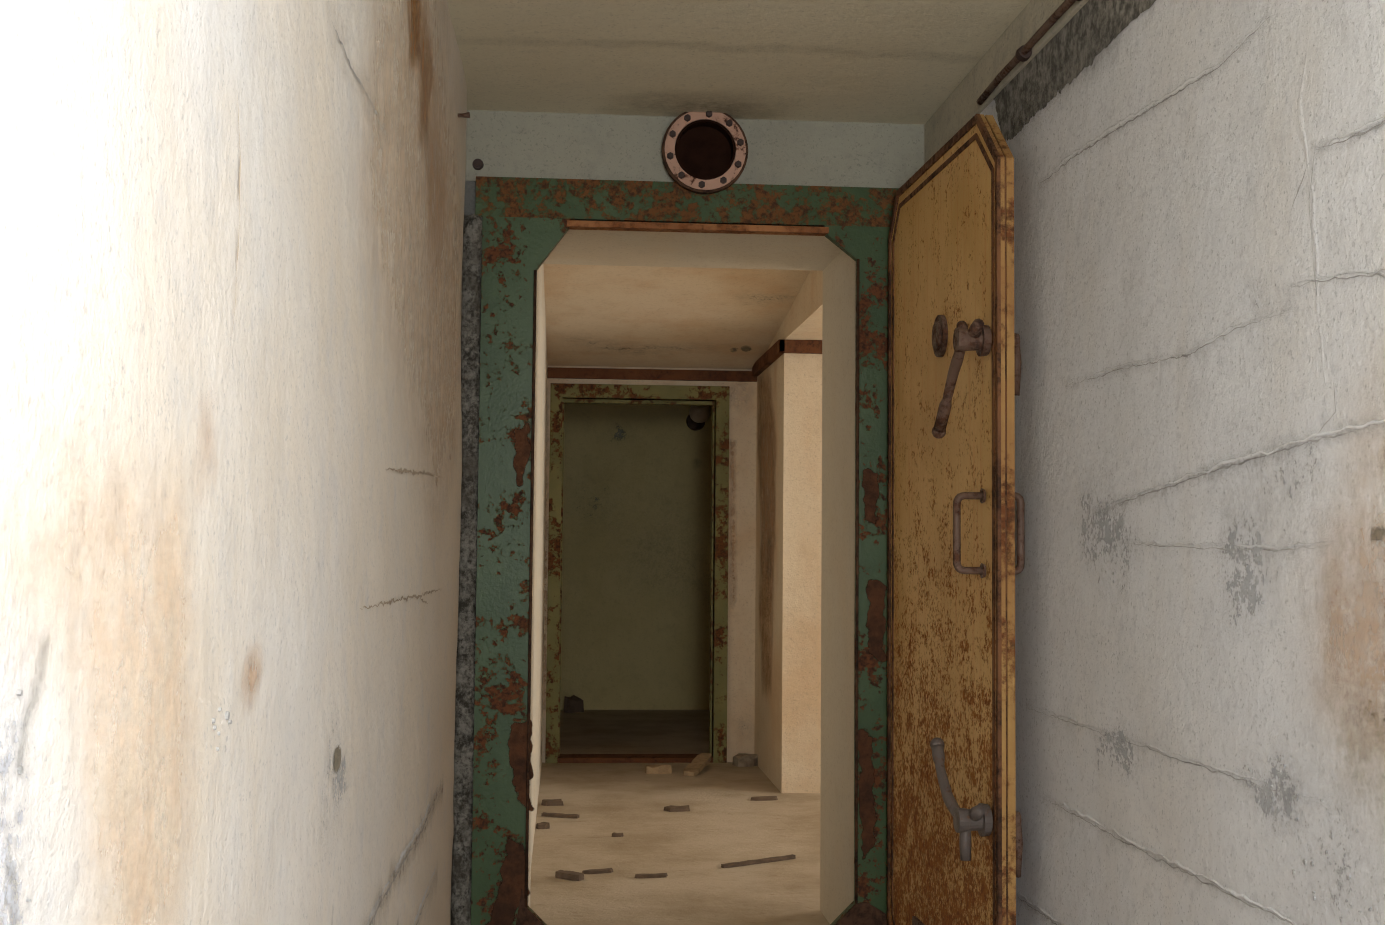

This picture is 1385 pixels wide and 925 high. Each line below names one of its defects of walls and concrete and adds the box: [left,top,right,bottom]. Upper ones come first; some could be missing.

crack [1040,14,1271,182]
crack [1067,29,1385,514]
peeling [513,422,531,487]
peeling [862,468,879,524]
crack [1119,539,1352,552]
peeling [866,579,887,662]
leakage [0,721,32,925]
crack [367,779,442,925]
peeling [485,836,530,925]
peeling [508,720,534,811]
peeling [858,729,877,860]